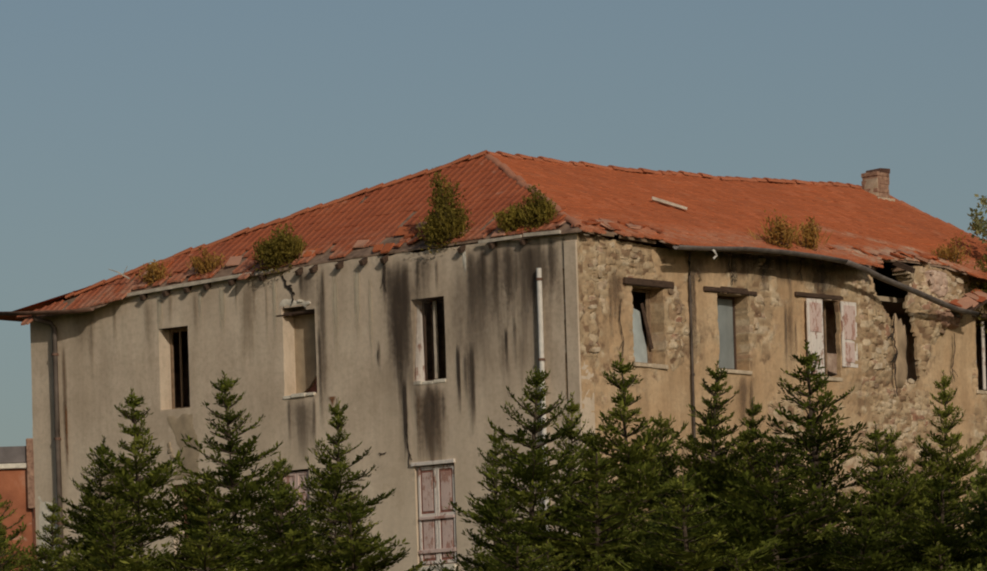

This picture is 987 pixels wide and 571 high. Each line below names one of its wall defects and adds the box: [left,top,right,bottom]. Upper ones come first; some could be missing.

leakage [289,403,315,434]
leakage [319,276,337,390]
leakage [383,263,439,444]
leakage [457,349,475,408]
flaking render [581,236,656,359]
flaking render [667,286,686,371]
flaking render [853,274,938,478]
peeling [924,270,948,298]
spalling [935,309,961,329]